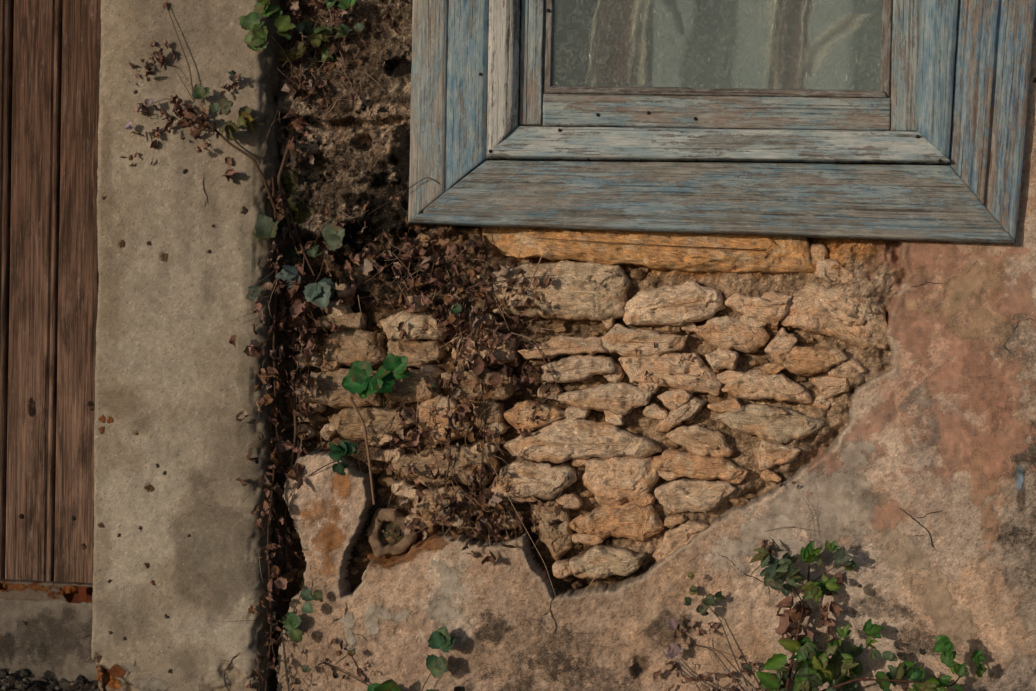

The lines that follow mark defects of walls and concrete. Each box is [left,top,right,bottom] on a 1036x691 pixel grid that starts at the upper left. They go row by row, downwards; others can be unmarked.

rust [0,583,93,603]
spalling [269,0,1036,691]